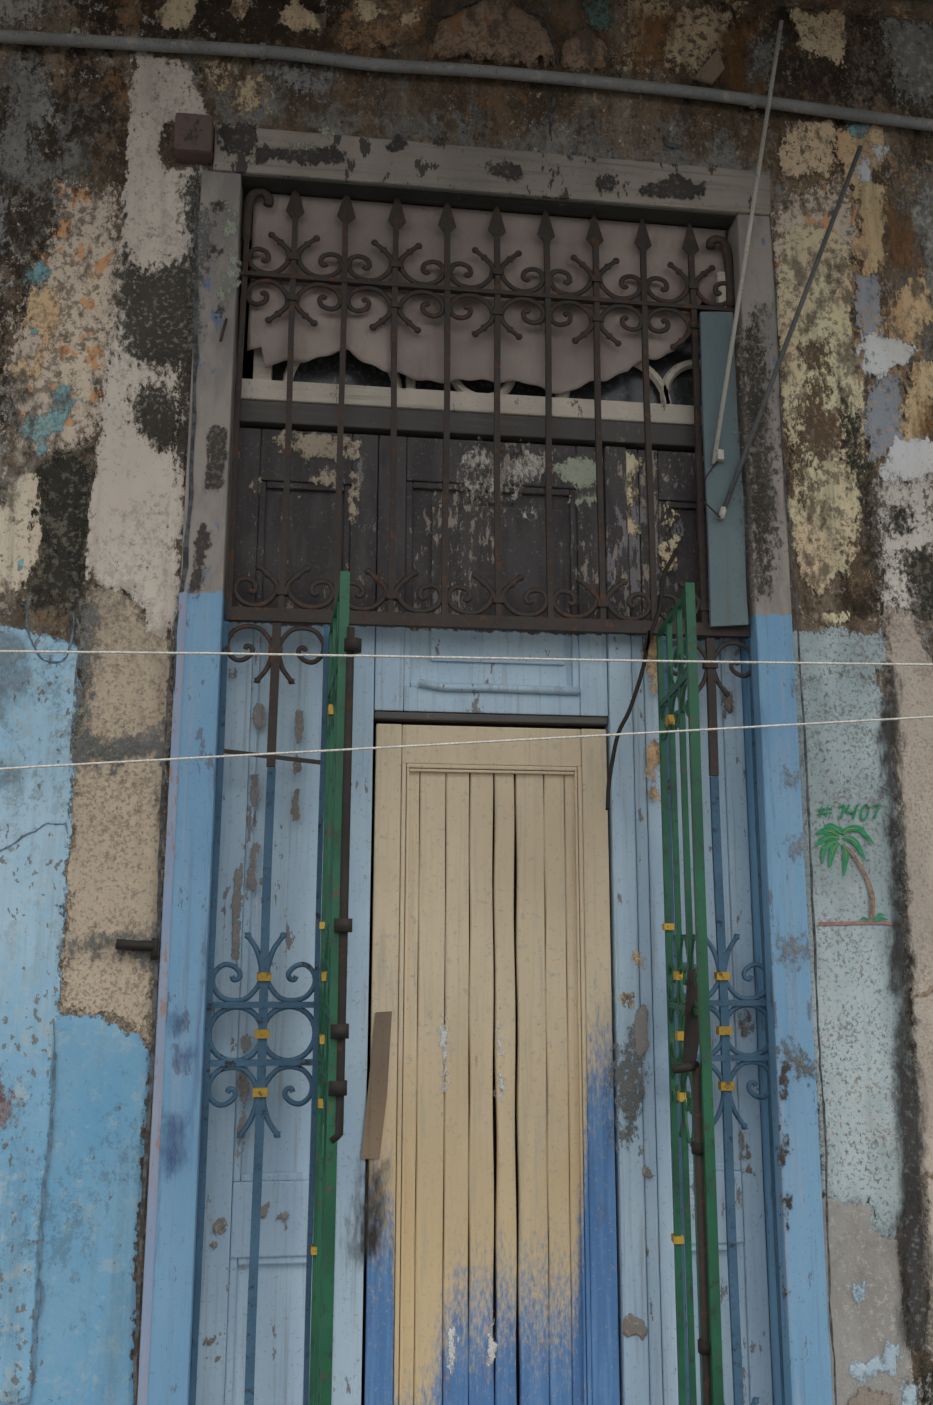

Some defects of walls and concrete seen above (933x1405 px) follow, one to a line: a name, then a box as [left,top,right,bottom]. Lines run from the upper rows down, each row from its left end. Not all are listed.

peeling [0,175,125,597]
crack [1,1022,57,1405]
crack [0,822,68,852]
peeling [606,992,655,1179]
peeling [730,119,933,1405]
leakage [877,666,933,1405]